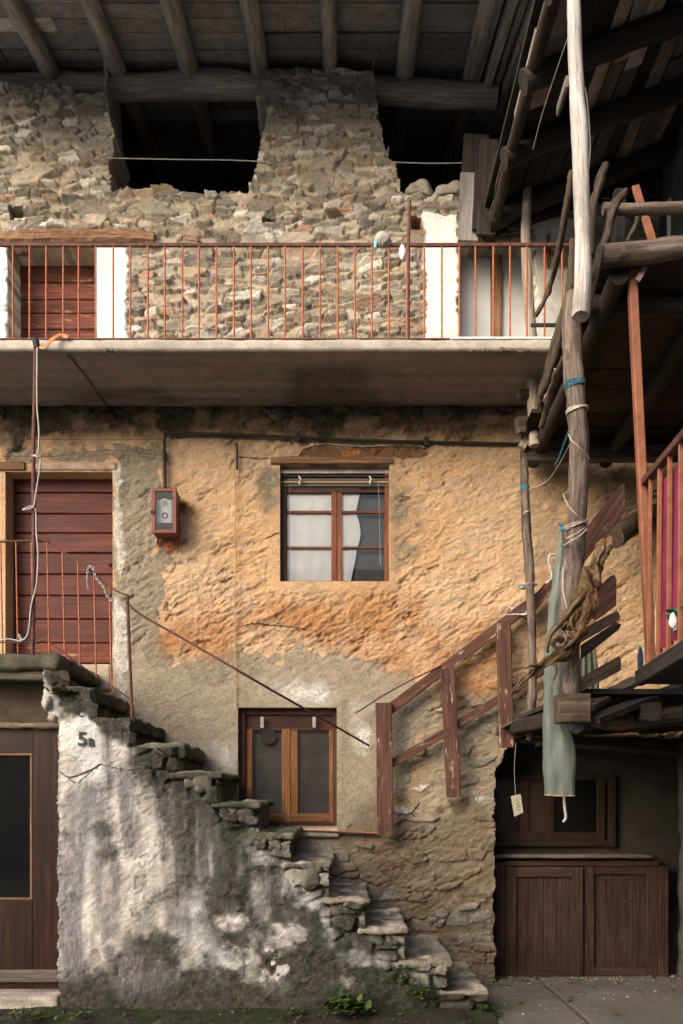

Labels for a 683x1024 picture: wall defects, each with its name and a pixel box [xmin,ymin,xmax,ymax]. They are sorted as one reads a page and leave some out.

crack [66,354,109,407]
corrosion [159,540,187,555]
water stain [47,671,89,718]
flaking render [6,443,434,900]
crack [59,764,147,783]
flaking render [436,798,468,814]
water stain [57,720,387,1011]
flaking render [429,893,493,954]